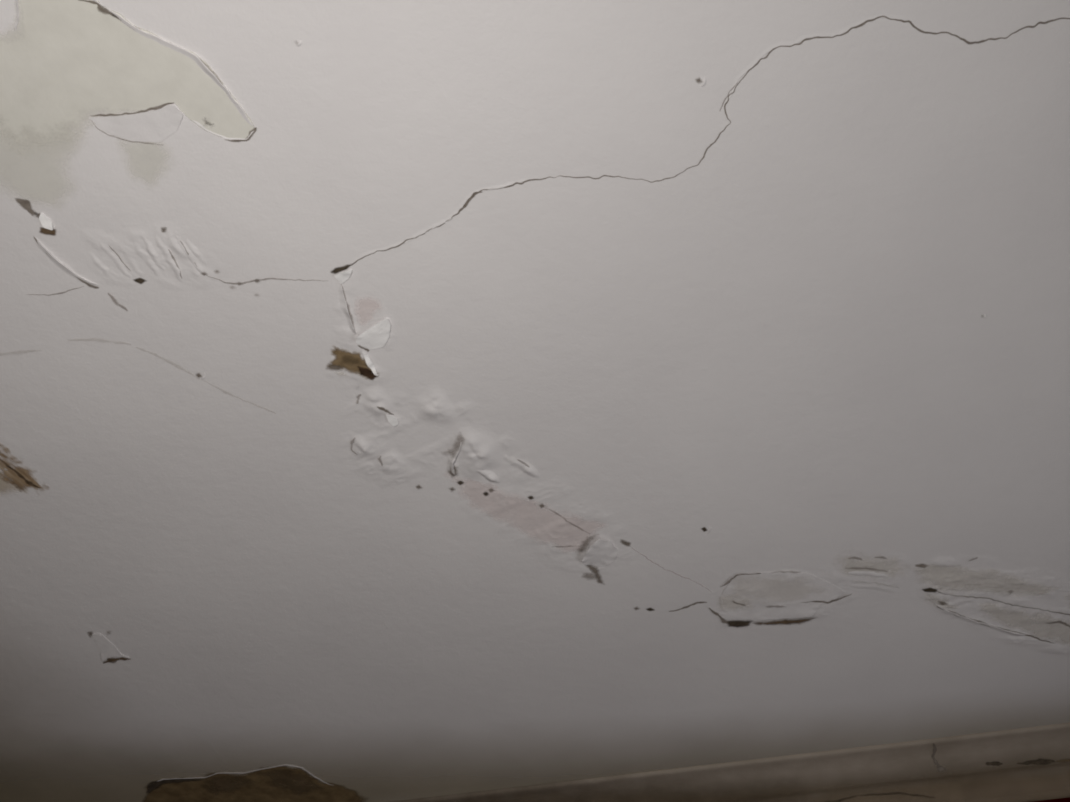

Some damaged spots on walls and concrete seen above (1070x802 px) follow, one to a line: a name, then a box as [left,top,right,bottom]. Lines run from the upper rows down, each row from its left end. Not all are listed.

peeling [0,0,257,201]
crack [342,13,1070,267]
peeling [39,212,53,230]
crack [202,271,320,285]
flaking render [0,445,42,491]
spalling [669,560,864,632]